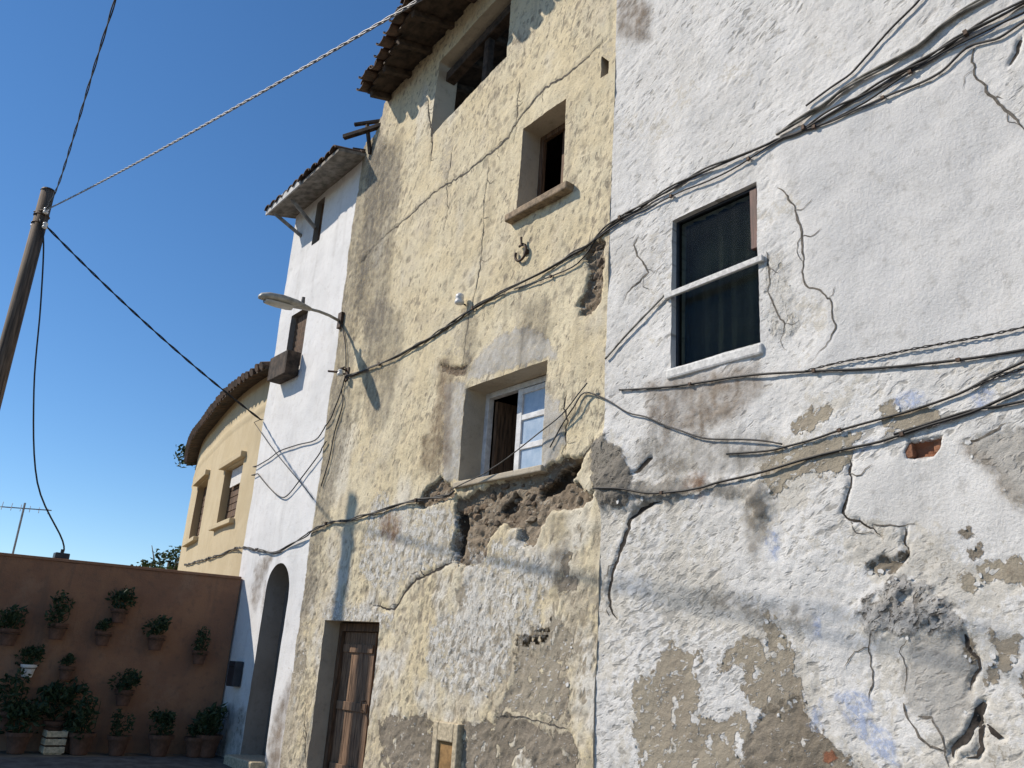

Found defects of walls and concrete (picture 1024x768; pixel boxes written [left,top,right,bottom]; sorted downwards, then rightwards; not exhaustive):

crack [963,49,1024,130]
crack [362,43,602,383]
flaking render [580,240,606,316]
crack [766,187,836,360]
flaking render [760,404,864,499]
flaking render [879,398,942,459]
crack [372,562,452,618]
peeling [359,458,594,768]
crack [605,501,661,618]
crack [841,462,909,562]
flaking render [958,526,1024,594]
flaking render [631,609,865,768]